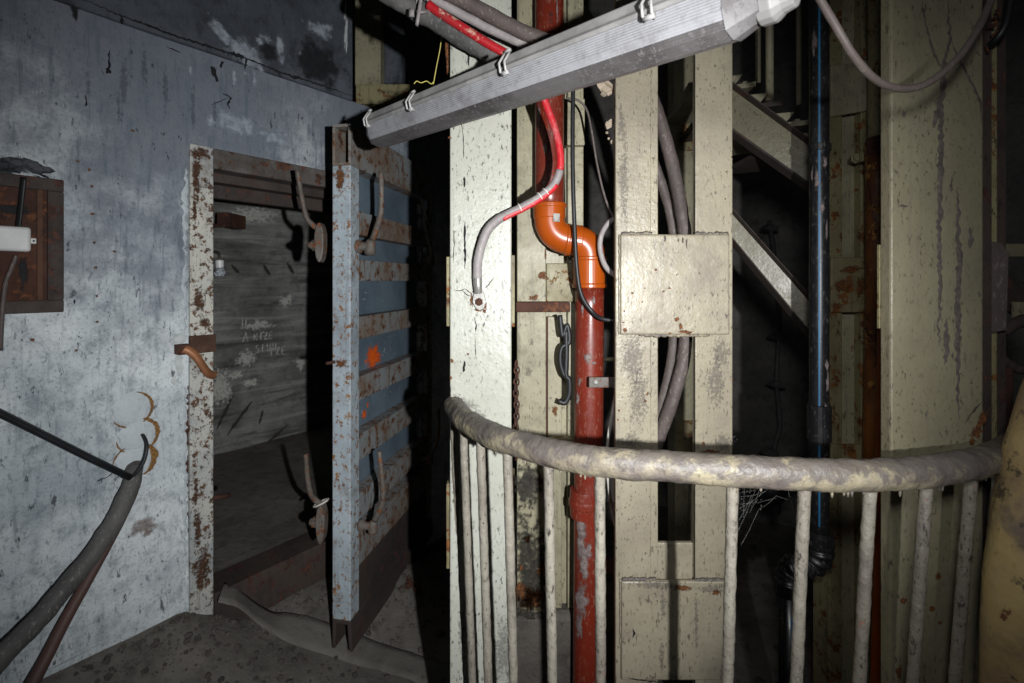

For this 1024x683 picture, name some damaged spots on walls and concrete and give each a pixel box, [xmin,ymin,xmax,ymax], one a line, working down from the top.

corrosion [192,146,211,224]
corrosion [194,287,210,330]